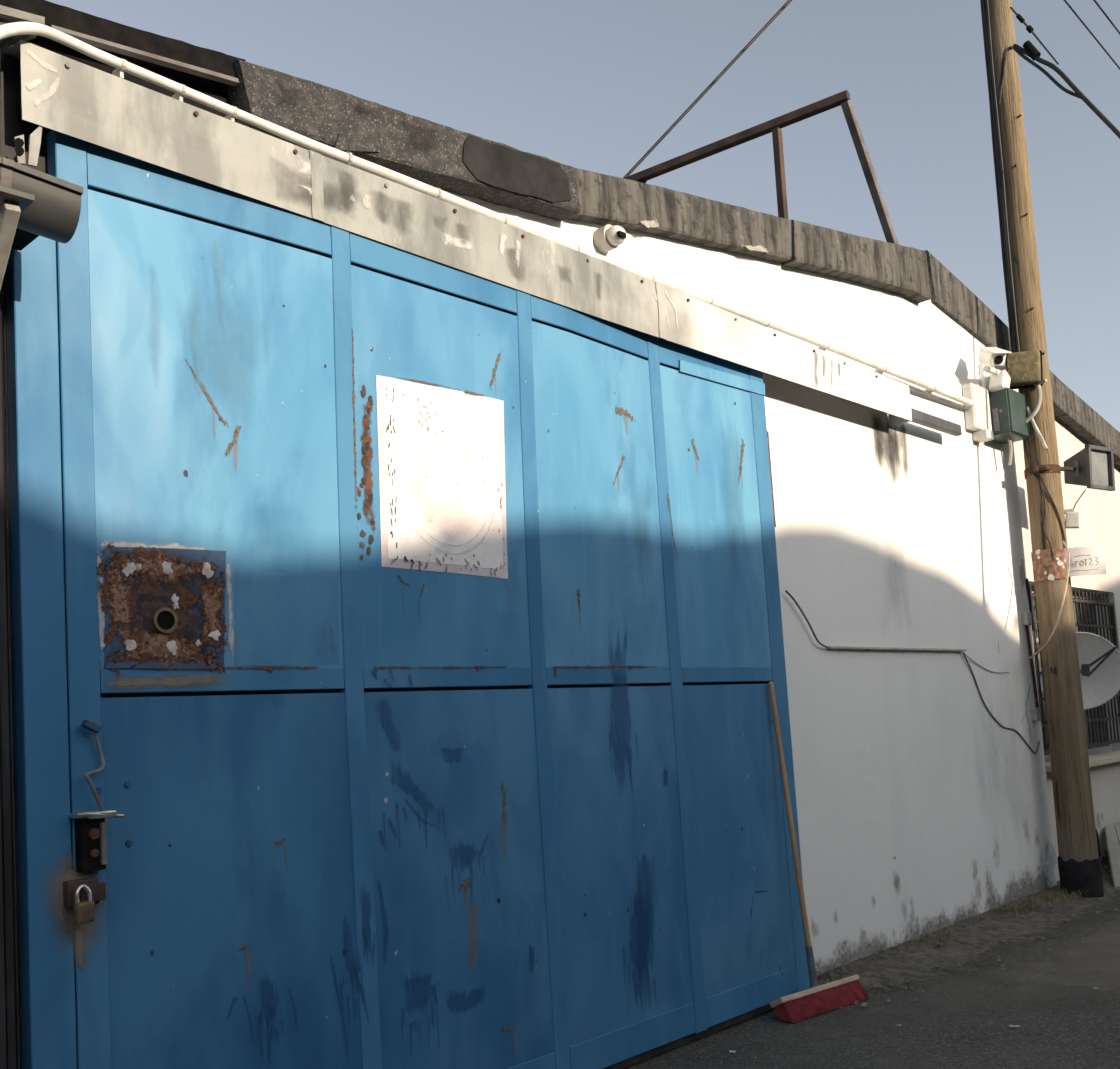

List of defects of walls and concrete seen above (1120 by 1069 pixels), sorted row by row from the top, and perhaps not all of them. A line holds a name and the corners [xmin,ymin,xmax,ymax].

corrosion [186,360,241,456]
corrosion [352,328,376,560]
damp [875,417,907,477]
corrosion [96,542,318,687]
corrosion [374,666,506,676]
corrosion [554,665,655,677]
corrosion [54,863,91,967]
damp [905,859,1048,941]
damp [816,939,890,976]